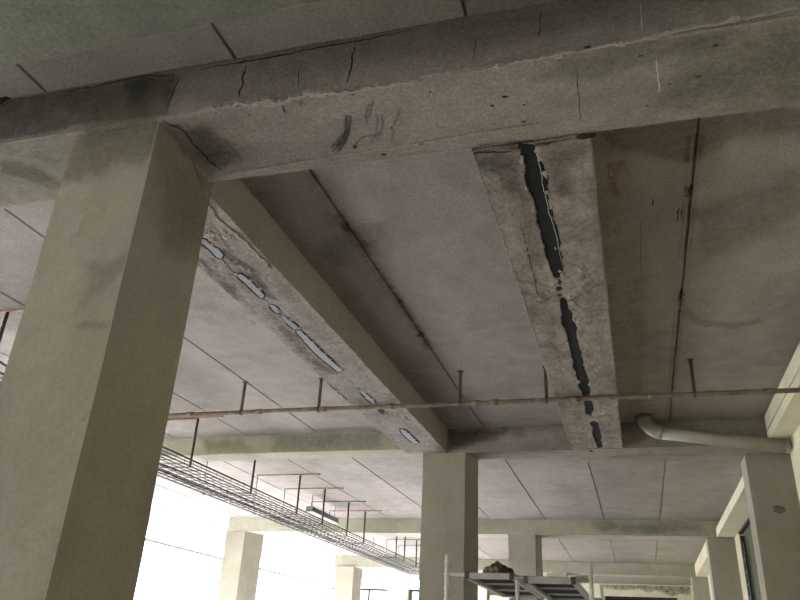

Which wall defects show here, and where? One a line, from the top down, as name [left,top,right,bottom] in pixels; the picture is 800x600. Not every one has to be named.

crack [201,30,410,98]
crack [60,75,221,170]
spalling [201,237,225,260]
crack [520,222,540,297]
spalling [234,273,344,372]
spalling [398,428,420,444]